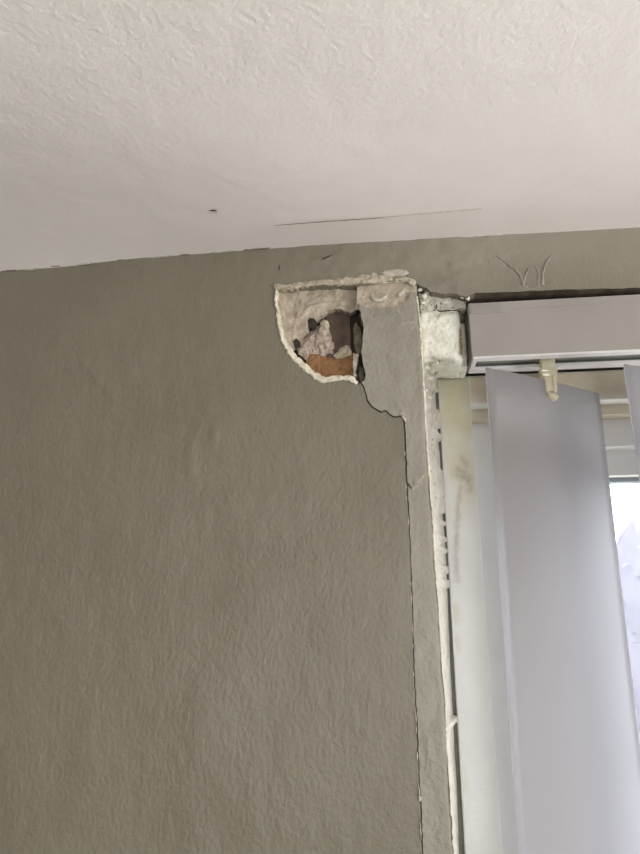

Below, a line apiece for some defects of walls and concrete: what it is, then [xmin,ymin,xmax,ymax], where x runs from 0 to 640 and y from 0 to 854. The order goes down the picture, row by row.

flaking render [274,269,442,413]
crack [361,384,425,854]